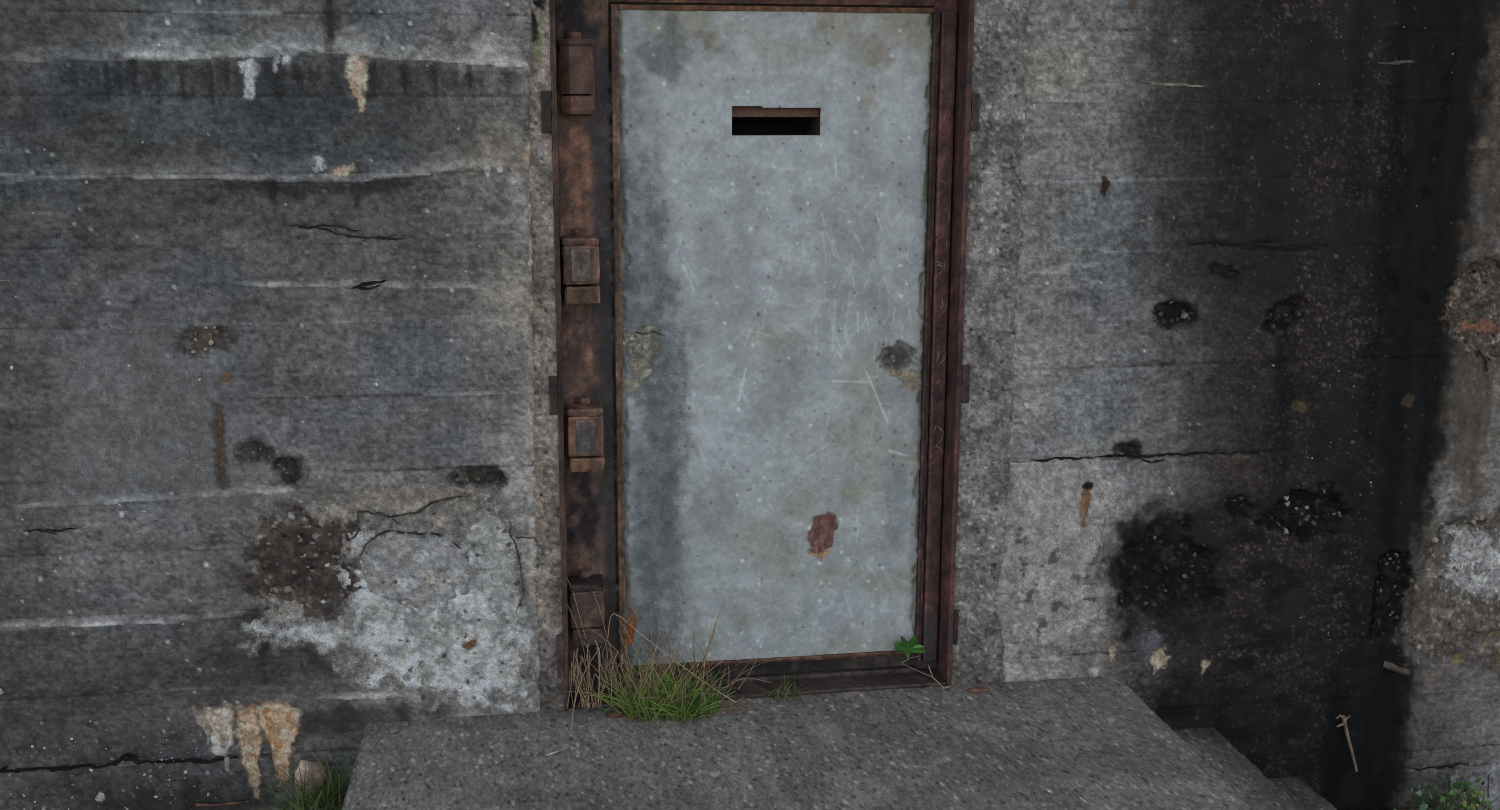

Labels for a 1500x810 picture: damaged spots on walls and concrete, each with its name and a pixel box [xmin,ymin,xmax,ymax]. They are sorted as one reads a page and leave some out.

spalling [1154,297,1198,330]
spalling [1442,256,1500,362]
spalling [880,345,921,389]
leakage [1090,0,1500,810]
spalling [234,440,541,713]
crack [322,496,469,565]
crack [507,517,537,612]
corrosion [808,513,838,561]
spalling [1225,489,1347,543]
spalling [1370,508,1500,672]
crack [0,754,265,773]